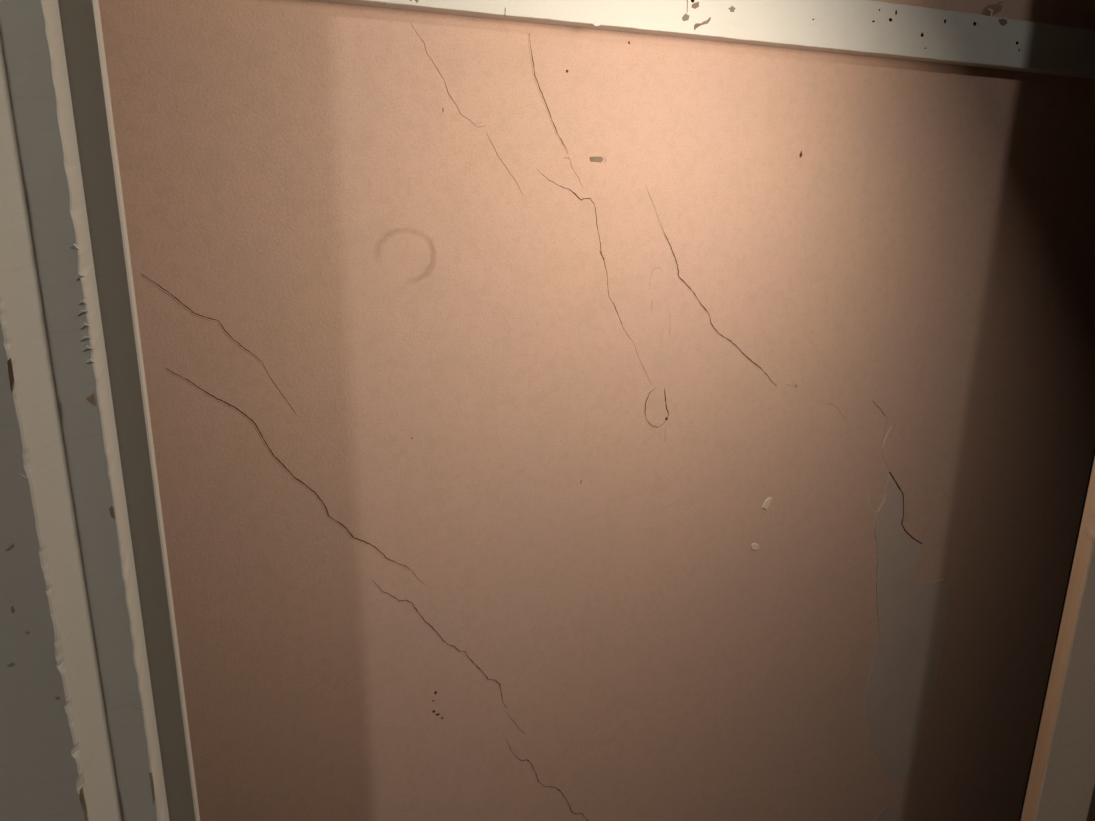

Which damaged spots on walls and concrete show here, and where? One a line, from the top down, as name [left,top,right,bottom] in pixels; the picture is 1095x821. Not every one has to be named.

crack [141,274,297,415]
crack [411,24,669,433]
crack [647,190,796,386]
crack [167,368,588,821]
peeling [863,468,950,781]